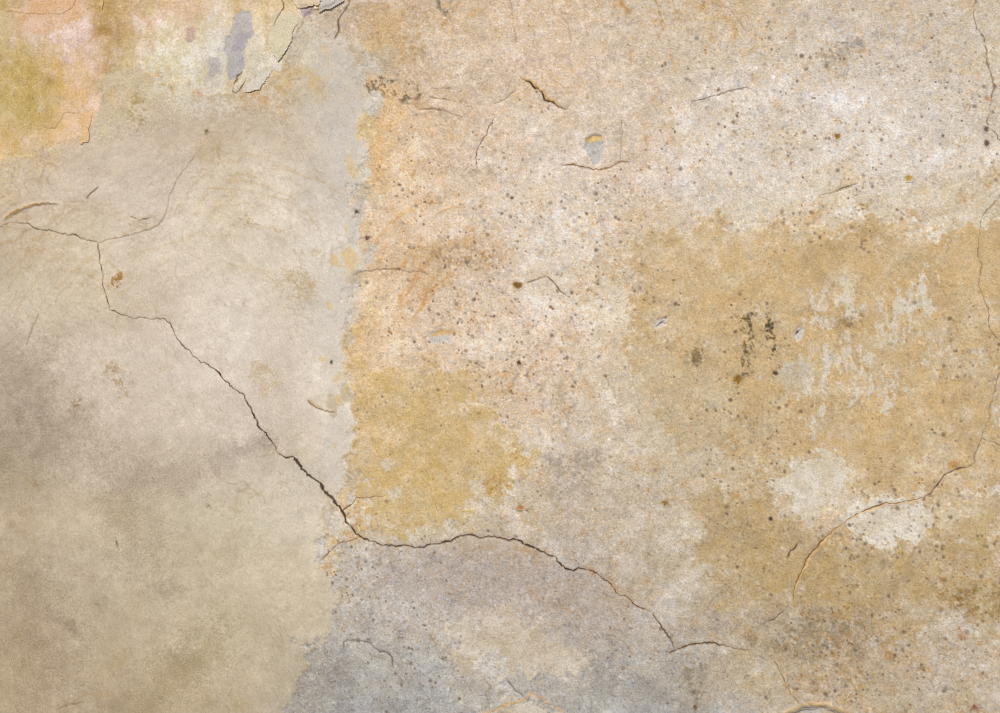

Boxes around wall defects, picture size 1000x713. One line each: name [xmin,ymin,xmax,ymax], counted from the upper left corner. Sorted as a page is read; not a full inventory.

crack [273,0,315,27]
crack [334,0,350,39]
peeling [0,0,348,151]
crack [232,70,246,94]
crack [691,86,752,102]
crack [972,0,1000,141]
crack [475,75,567,166]
leakage [683,347,711,370]
mould [738,312,780,382]
crack [0,156,1000,654]
crack [342,639,394,667]
crack [773,658,801,704]